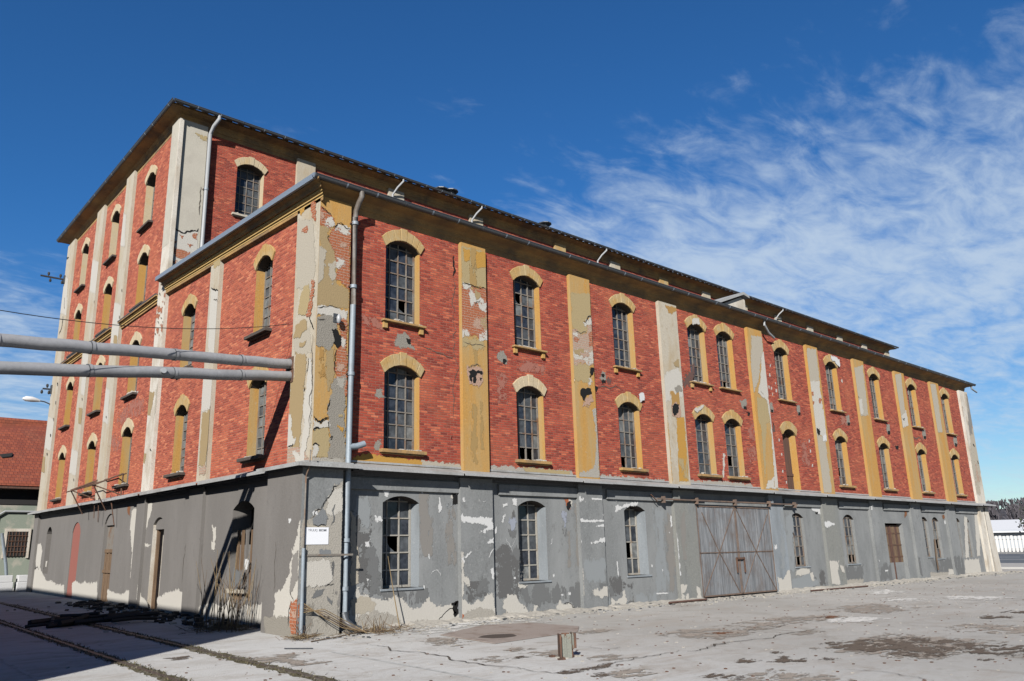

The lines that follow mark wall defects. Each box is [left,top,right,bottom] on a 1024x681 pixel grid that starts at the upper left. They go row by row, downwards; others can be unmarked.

flaking render [287,200,351,463]
flaking render [461,246,487,338]
flaking render [467,366,483,388]
flaking render [570,292,606,478]
flaking render [740,335,787,489]
flaking render [797,348,832,493]
flaking render [32,503,182,614]
flaking render [198,481,538,637]